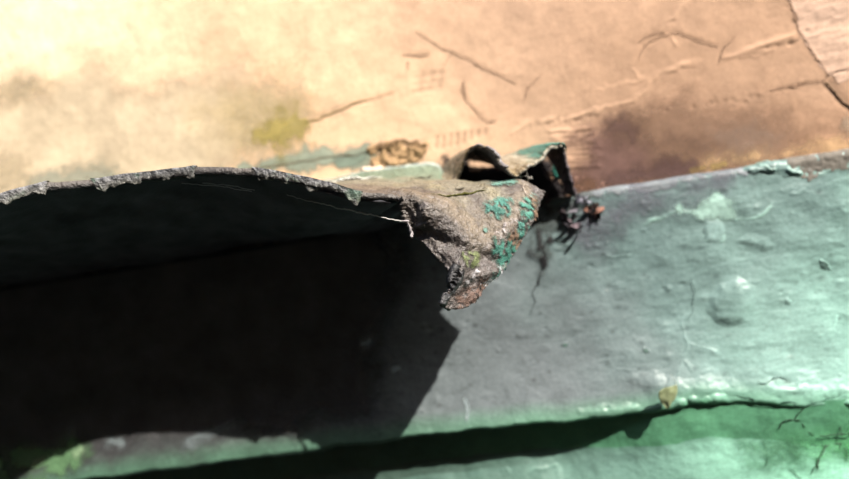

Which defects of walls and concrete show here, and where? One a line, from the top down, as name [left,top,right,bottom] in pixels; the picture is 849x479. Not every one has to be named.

crack [771,0,849,107]
leakage [0,62,310,193]
leakage [627,97,849,189]
spalling [779,148,849,181]
peeling [0,139,546,479]
crack [735,377,840,405]